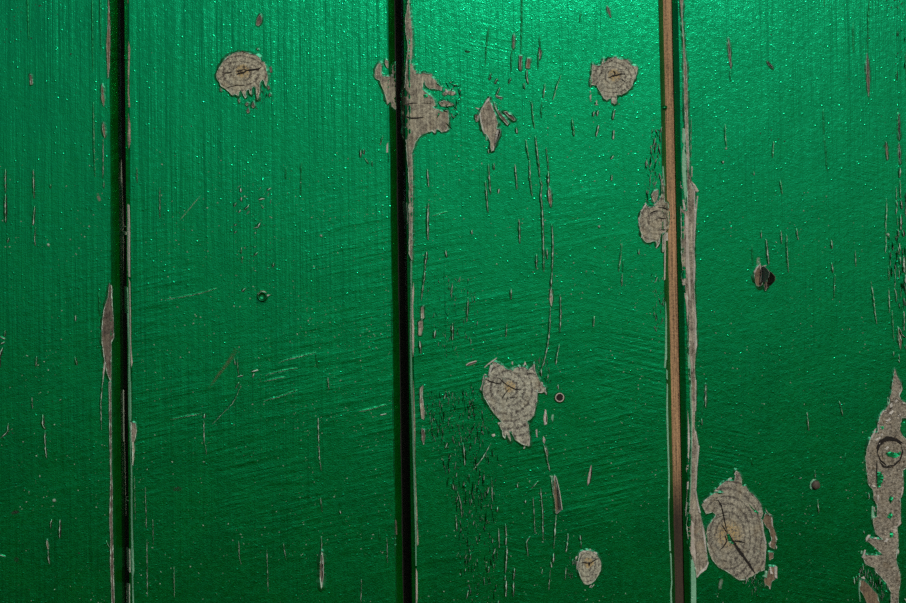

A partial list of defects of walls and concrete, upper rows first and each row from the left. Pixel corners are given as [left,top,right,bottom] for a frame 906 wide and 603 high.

peeling [214,47,273,114]
peeling [588,55,639,107]
peeling [373,0,554,603]
peeling [637,0,779,603]
peeling [567,548,603,588]
peeling [858,367,906,603]